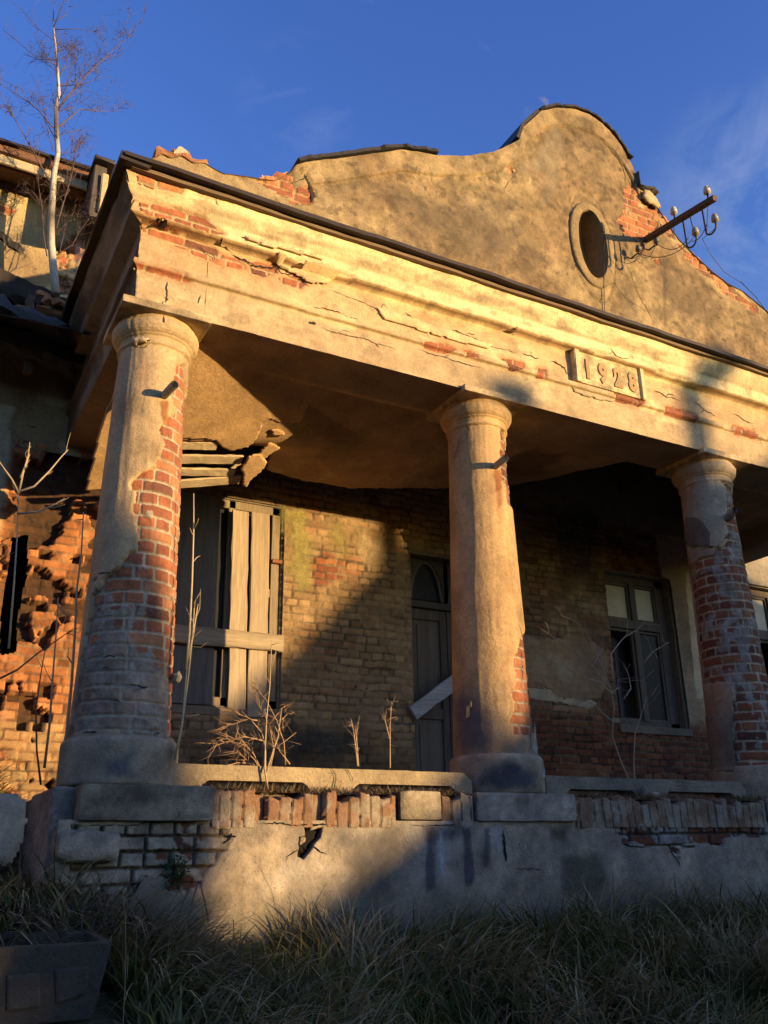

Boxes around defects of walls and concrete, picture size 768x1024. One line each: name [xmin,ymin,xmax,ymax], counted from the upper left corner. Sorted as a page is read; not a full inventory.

flaking render [244,235,341,284]
crack [198,238,411,349]
flaking render [240,428,285,487]
peeling [684,517,711,547]
flaking render [685,572,703,699]
flaking render [528,688,597,709]
crack [260,822,349,857]
water stain [426,827,447,889]
water stain [465,828,489,884]